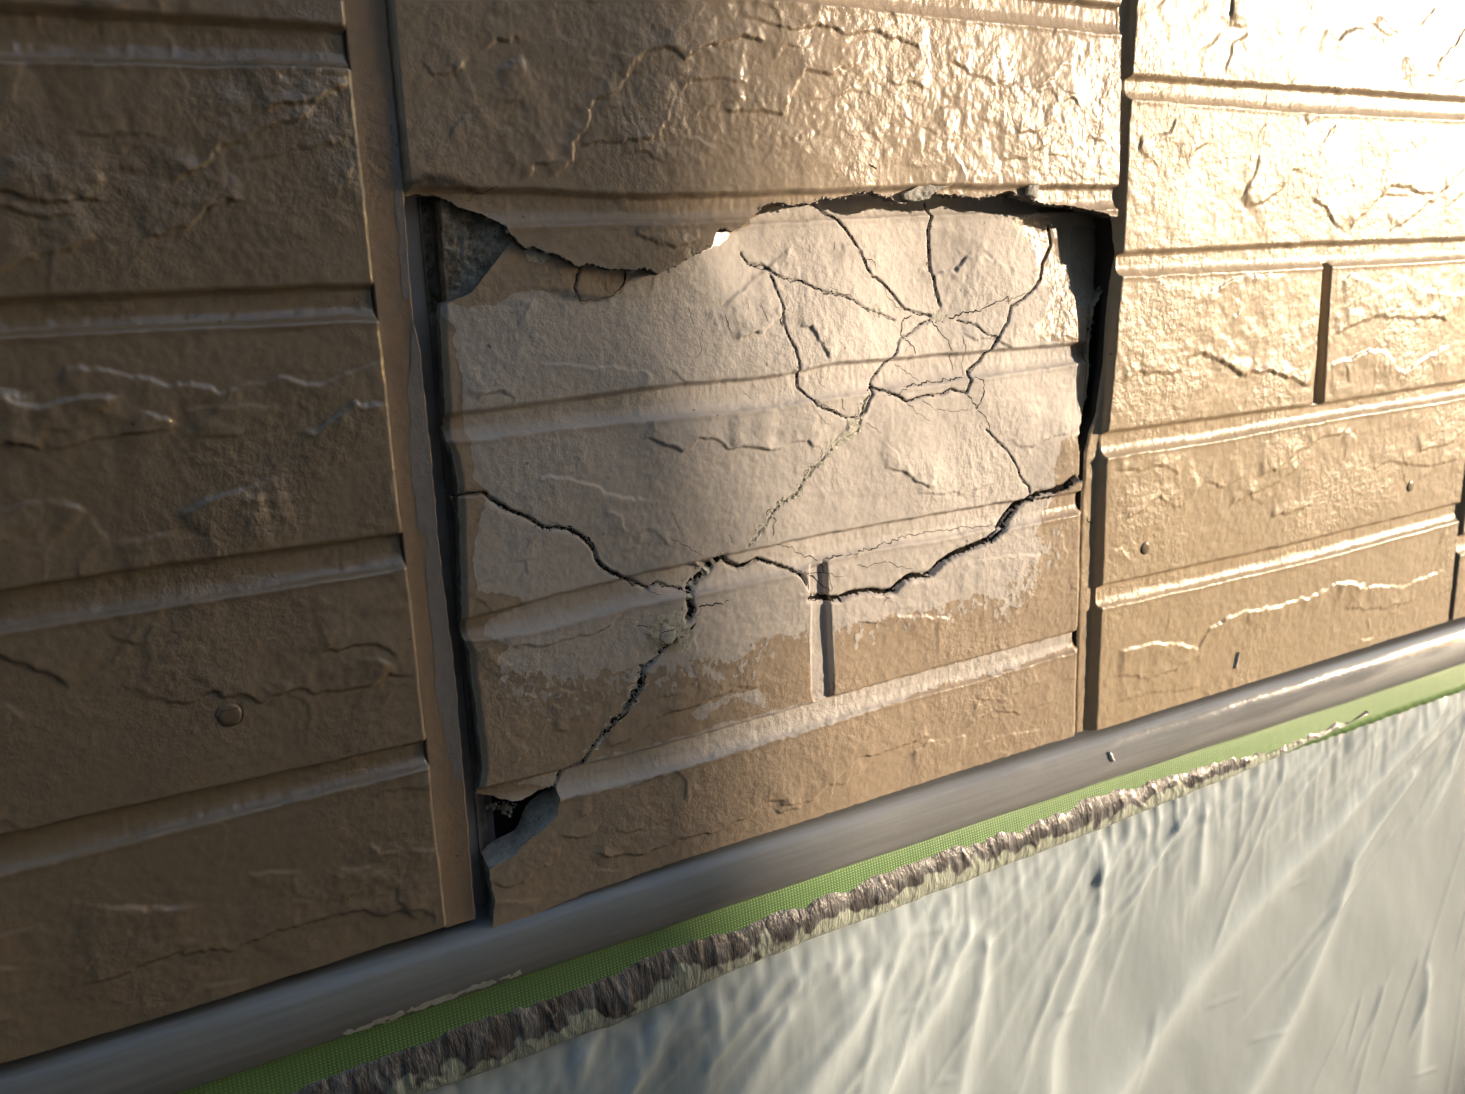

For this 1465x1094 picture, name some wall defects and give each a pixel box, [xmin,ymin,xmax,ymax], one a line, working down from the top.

peeling [434,184,1081,867]
crack [444,204,1073,788]